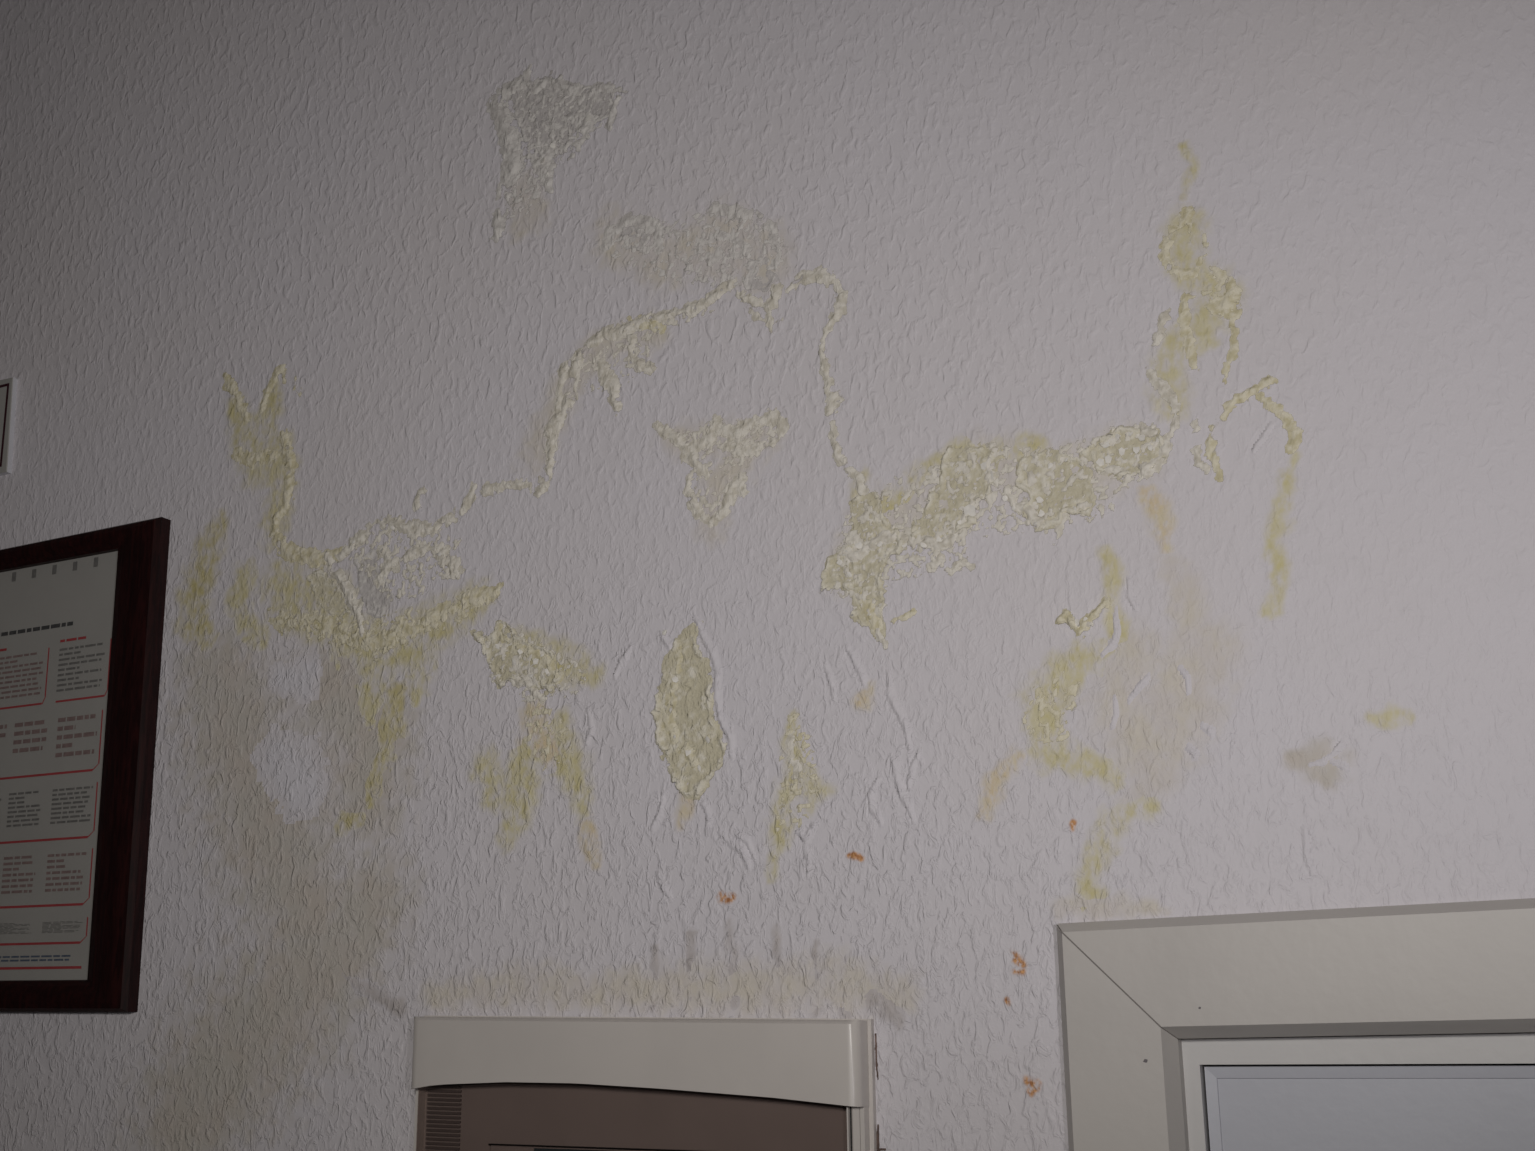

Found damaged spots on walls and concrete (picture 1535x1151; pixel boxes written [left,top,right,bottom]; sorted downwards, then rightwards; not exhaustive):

peeling [219,364,343,570]
flaking render [735,137,1304,650]
flaking render [469,617,611,704]
flaking render [651,615,738,837]
water stain [973,446,1305,926]
corrosion [844,849,866,864]
corrosion [1008,947,1029,979]
corrosion [1021,1073,1044,1100]